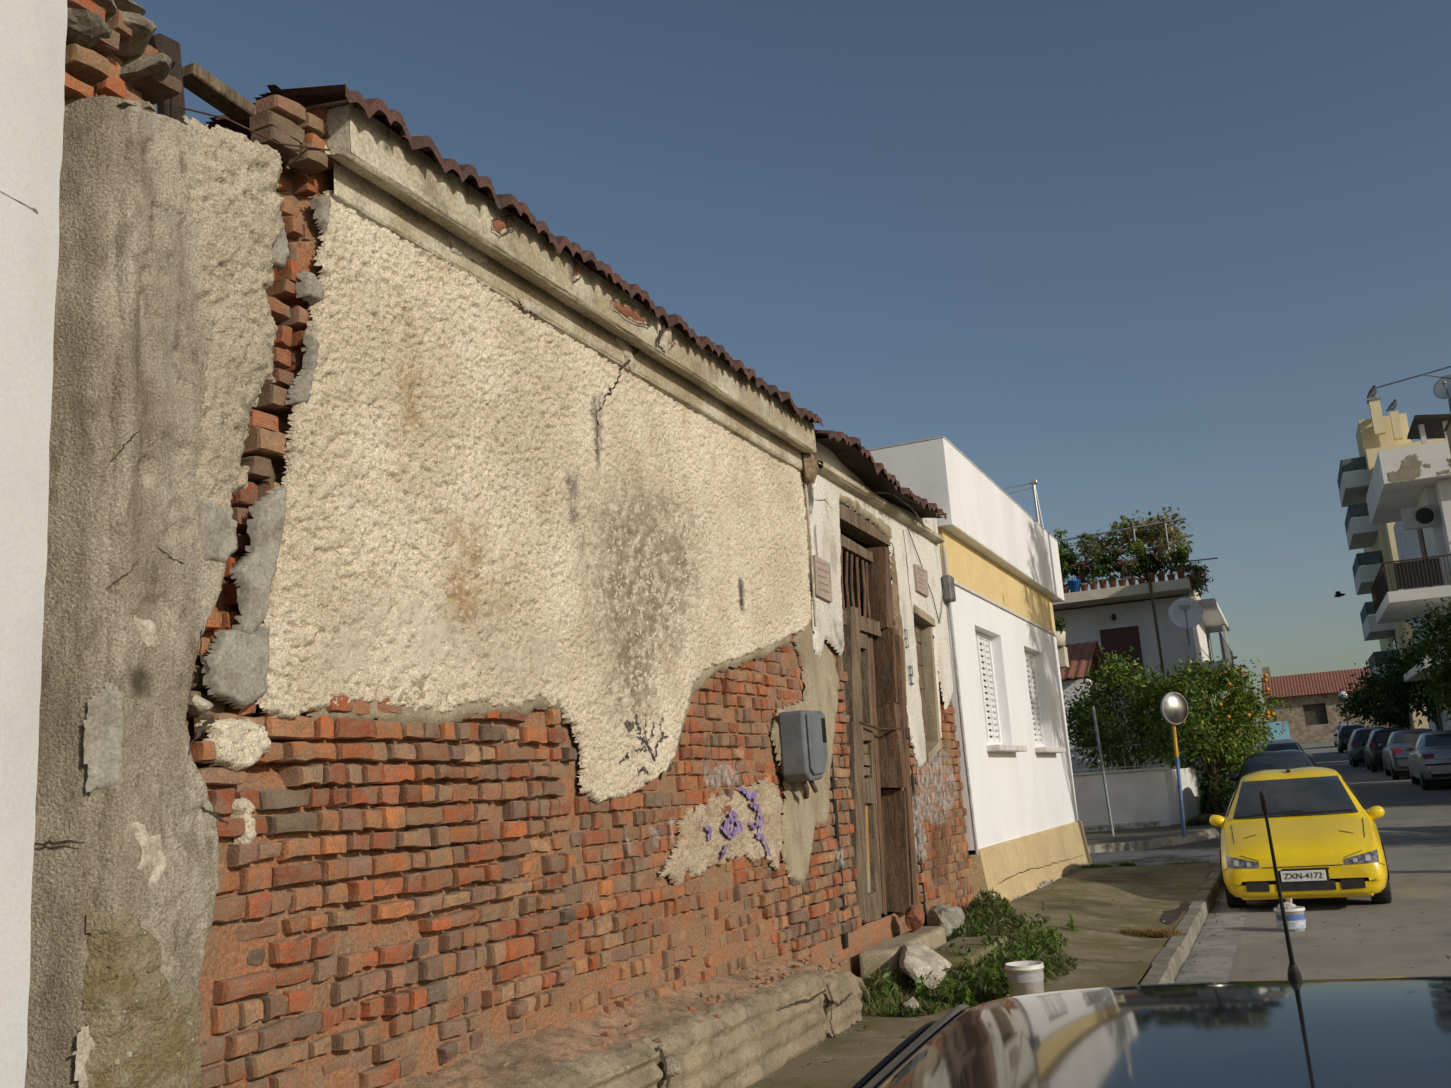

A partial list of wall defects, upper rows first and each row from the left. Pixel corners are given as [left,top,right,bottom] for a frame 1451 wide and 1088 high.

crack [596,314,676,440]
peeling [198,498,238,563]
peeling [1387,454,1451,483]
spalling [839,493,975,930]
spalling [72,634,862,1088]